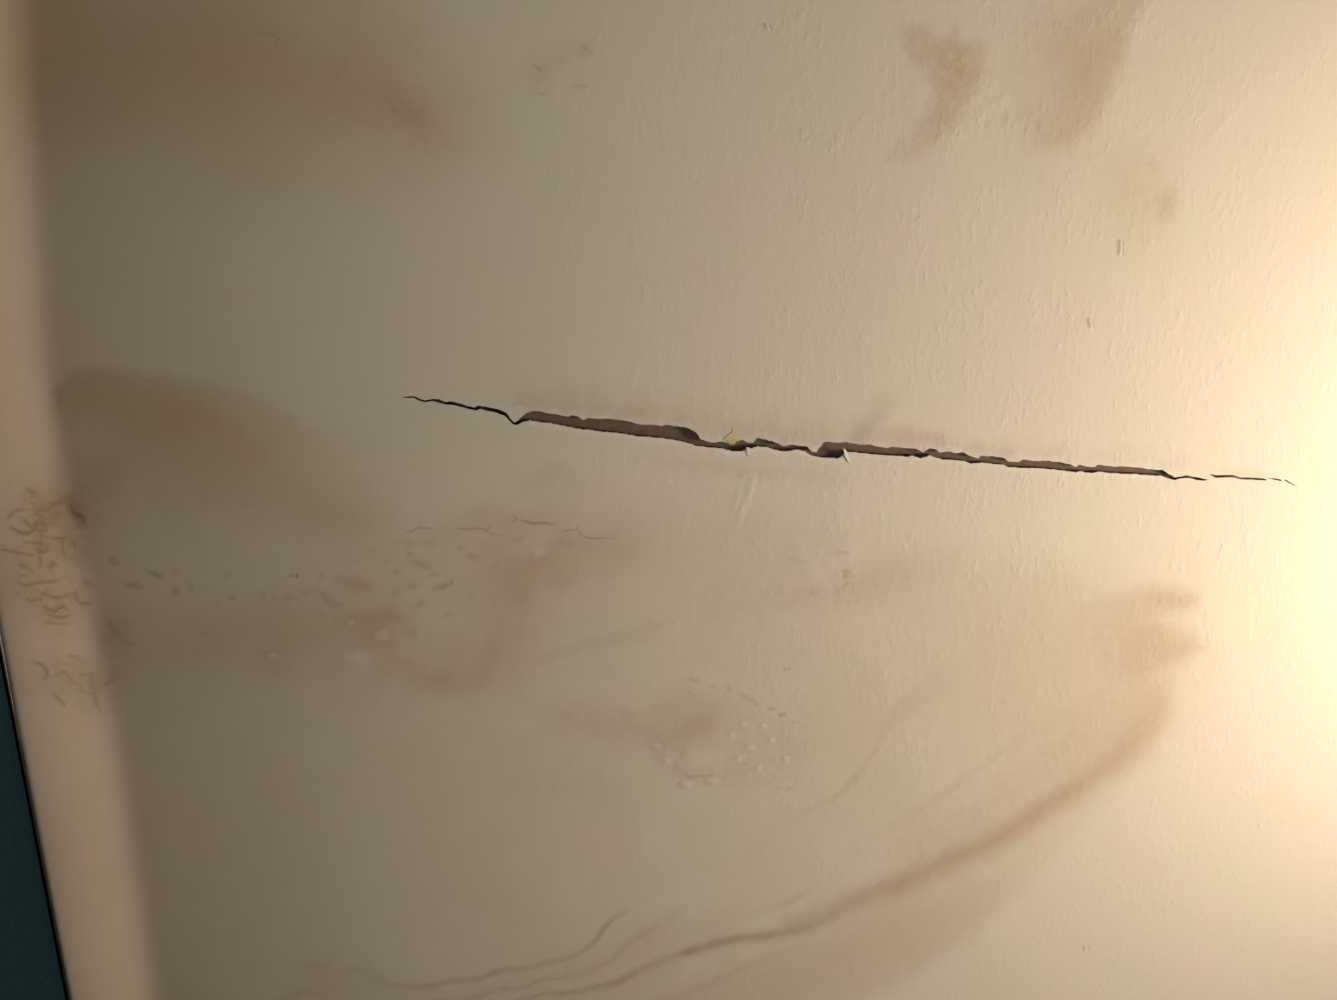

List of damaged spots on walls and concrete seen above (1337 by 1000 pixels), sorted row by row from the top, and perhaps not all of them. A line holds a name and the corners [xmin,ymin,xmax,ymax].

damp [62,378,275,486]
crack [402,395,1296,486]
damp [837,626,1193,908]